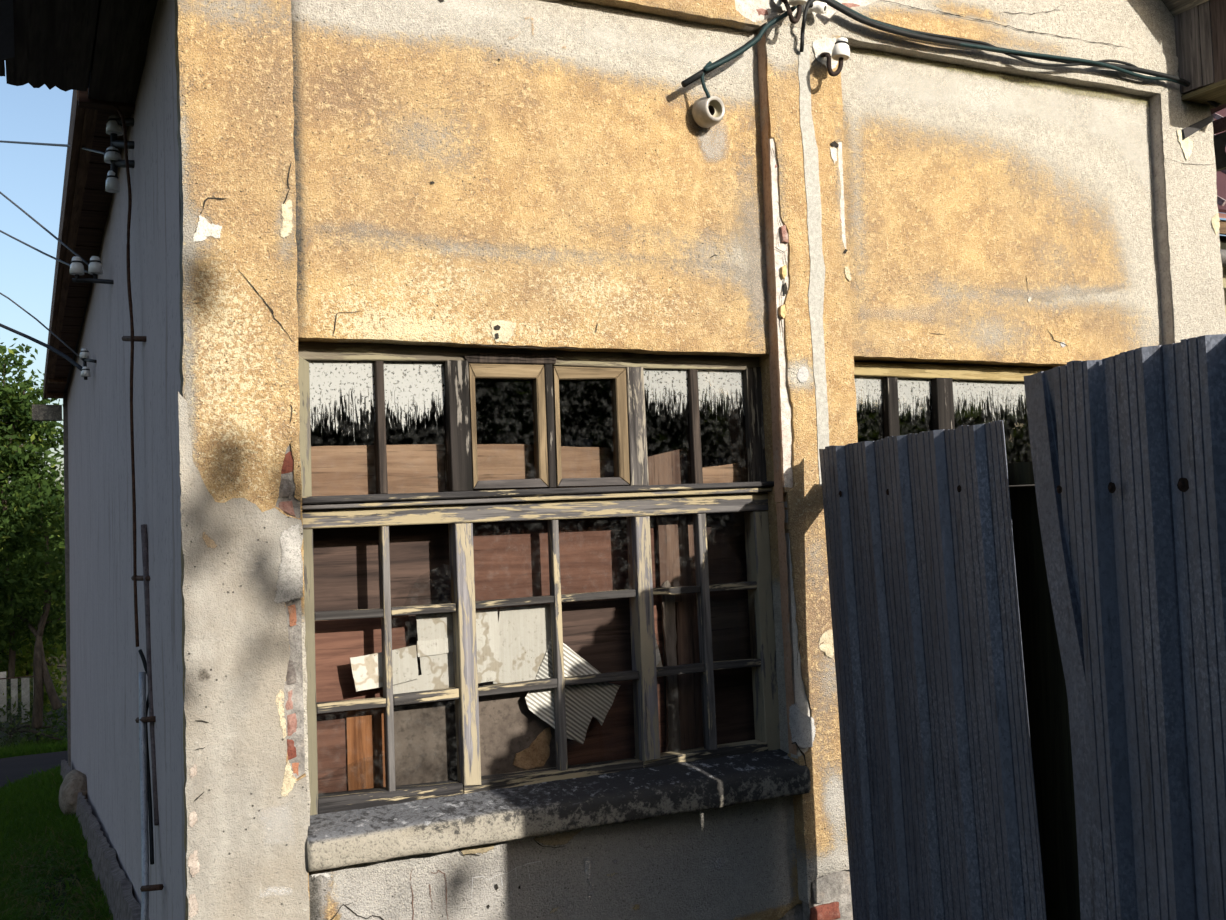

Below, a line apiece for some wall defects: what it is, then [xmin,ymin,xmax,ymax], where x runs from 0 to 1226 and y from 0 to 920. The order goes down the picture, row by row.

flaking render [735,0,877,69]
peeling [193,215,222,242]
peeling [280,199,294,238]
crack [239,271,291,339]
flaking render [276,444,300,518]
flaking render [768,138,816,759]
flaking render [275,598,305,797]
crack [331,902,384,920]
flaking render [778,870,853,920]